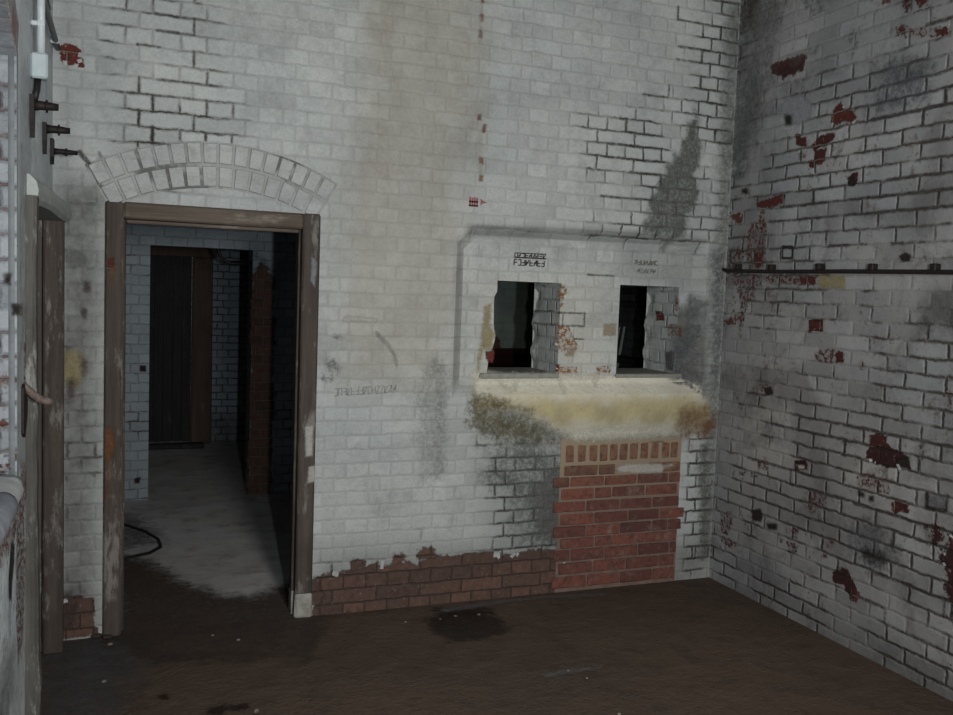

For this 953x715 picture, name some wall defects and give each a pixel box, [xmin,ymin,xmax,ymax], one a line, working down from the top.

spalling [59,43,84,68]
spalling [903,0,933,13]
peeling [892,24,951,38]
spalling [785,101,857,170]
leakage [645,120,700,235]
leakage [475,395,664,444]
spalling [857,433,911,514]
spalling [925,492,949,512]
peeling [311,546,566,616]
spalling [832,567,860,602]
spalling [924,523,953,622]